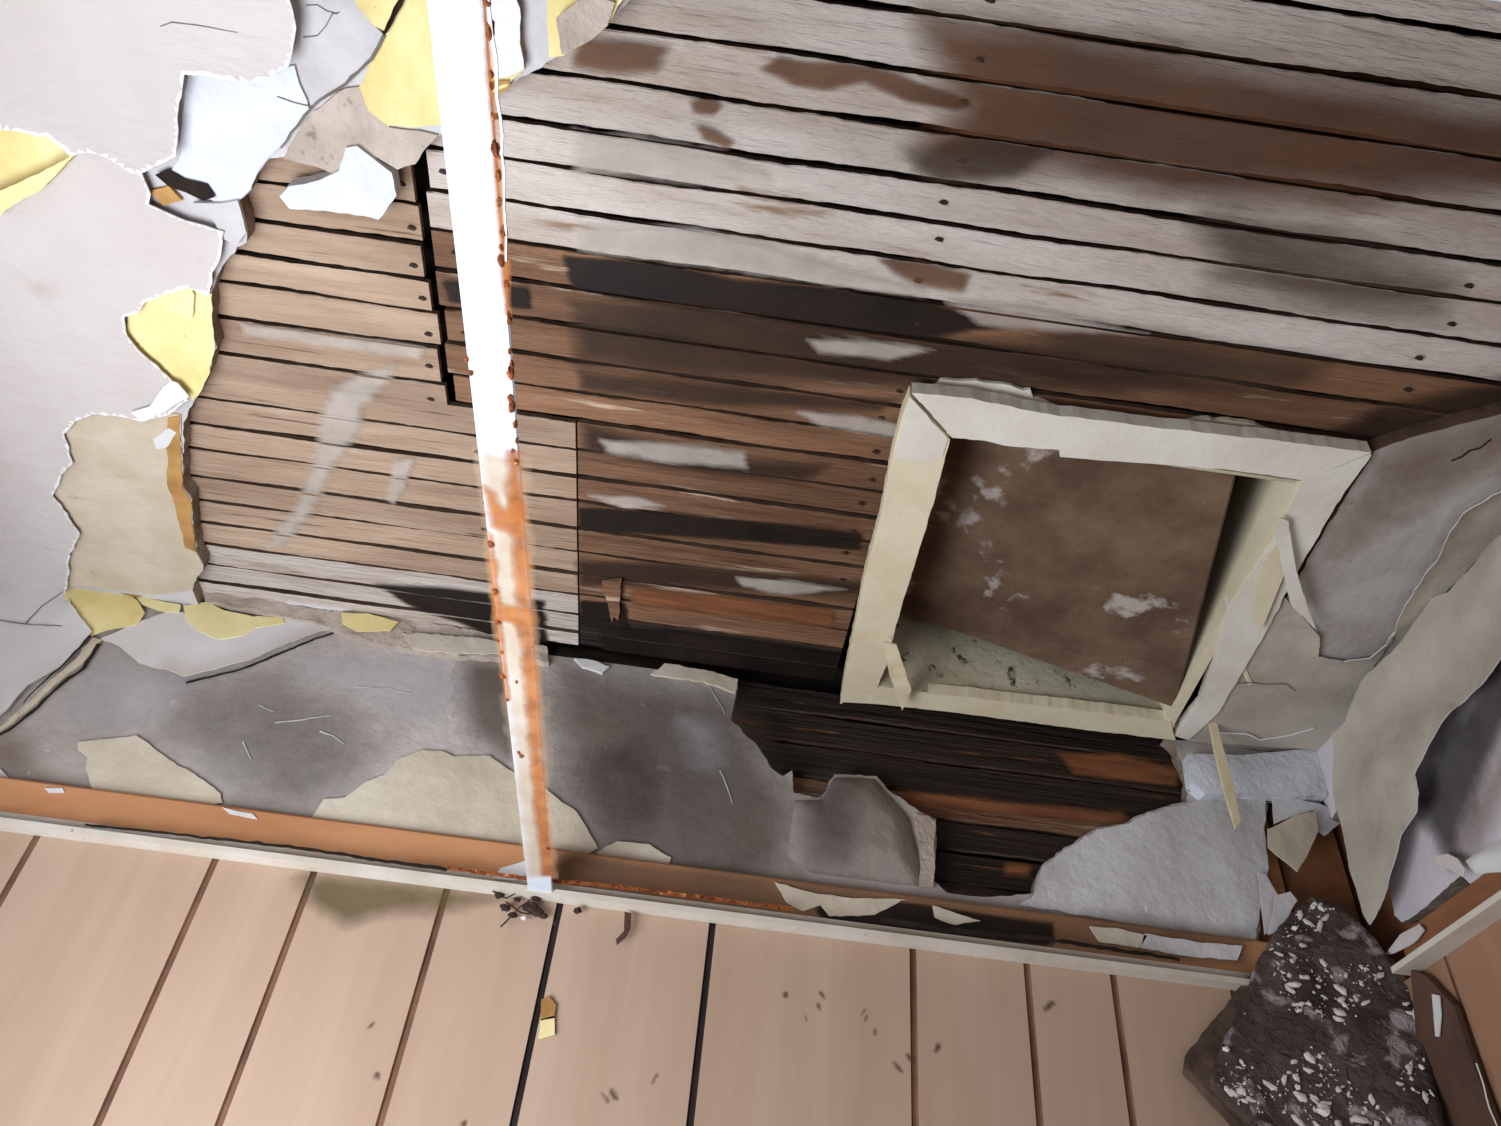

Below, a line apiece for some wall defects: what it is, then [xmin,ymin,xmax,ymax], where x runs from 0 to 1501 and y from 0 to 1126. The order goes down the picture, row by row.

rust [482,0,512,325]
damp [574,42,663,72]
damp [764,26,1501,192]
flaking render [0,0,502,716]
damp [563,257,1299,409]
flaking render [494,0,1501,925]
rust [85,348,795,911]
damp [579,563,855,681]
peeling [77,735,257,819]
peeling [312,750,526,881]
damp [475,669,512,748]
rust [880,917,1180,962]